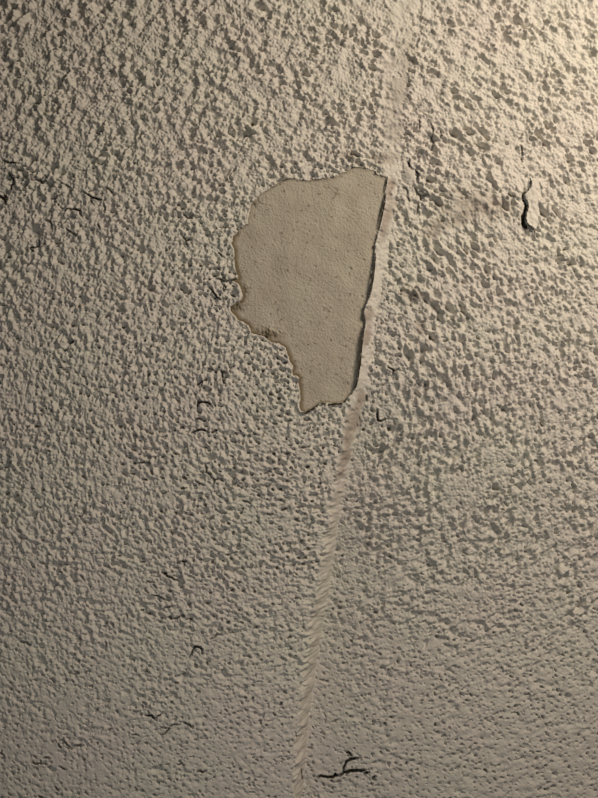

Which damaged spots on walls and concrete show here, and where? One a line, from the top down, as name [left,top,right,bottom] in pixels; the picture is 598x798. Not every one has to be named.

peeling [228,164,389,415]
crack [301,752,376,780]